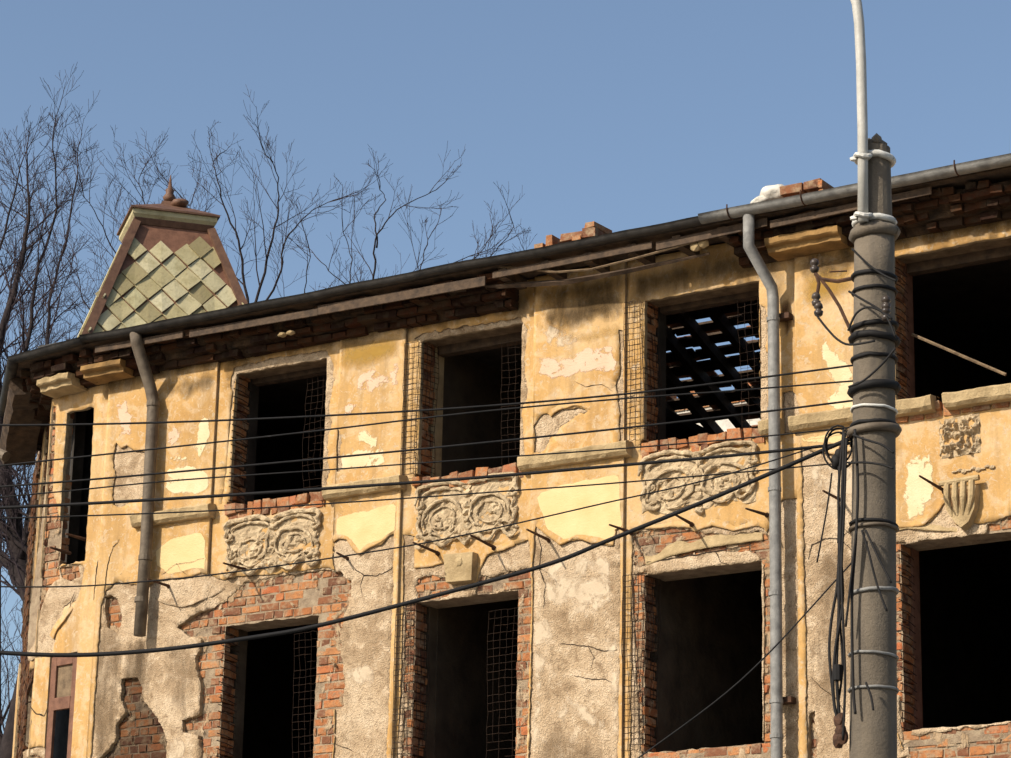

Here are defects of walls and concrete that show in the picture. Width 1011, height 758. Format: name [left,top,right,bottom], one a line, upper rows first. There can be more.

flaking render [111,401,145,507]
peeling [166,418,210,494]
spalling [228,351,385,487]
spalling [415,318,587,455]
peeling [539,326,624,441]
peeling [821,341,853,409]
flaking render [15,406,85,758]
flaking render [781,391,852,758]
flaking render [896,455,1011,758]